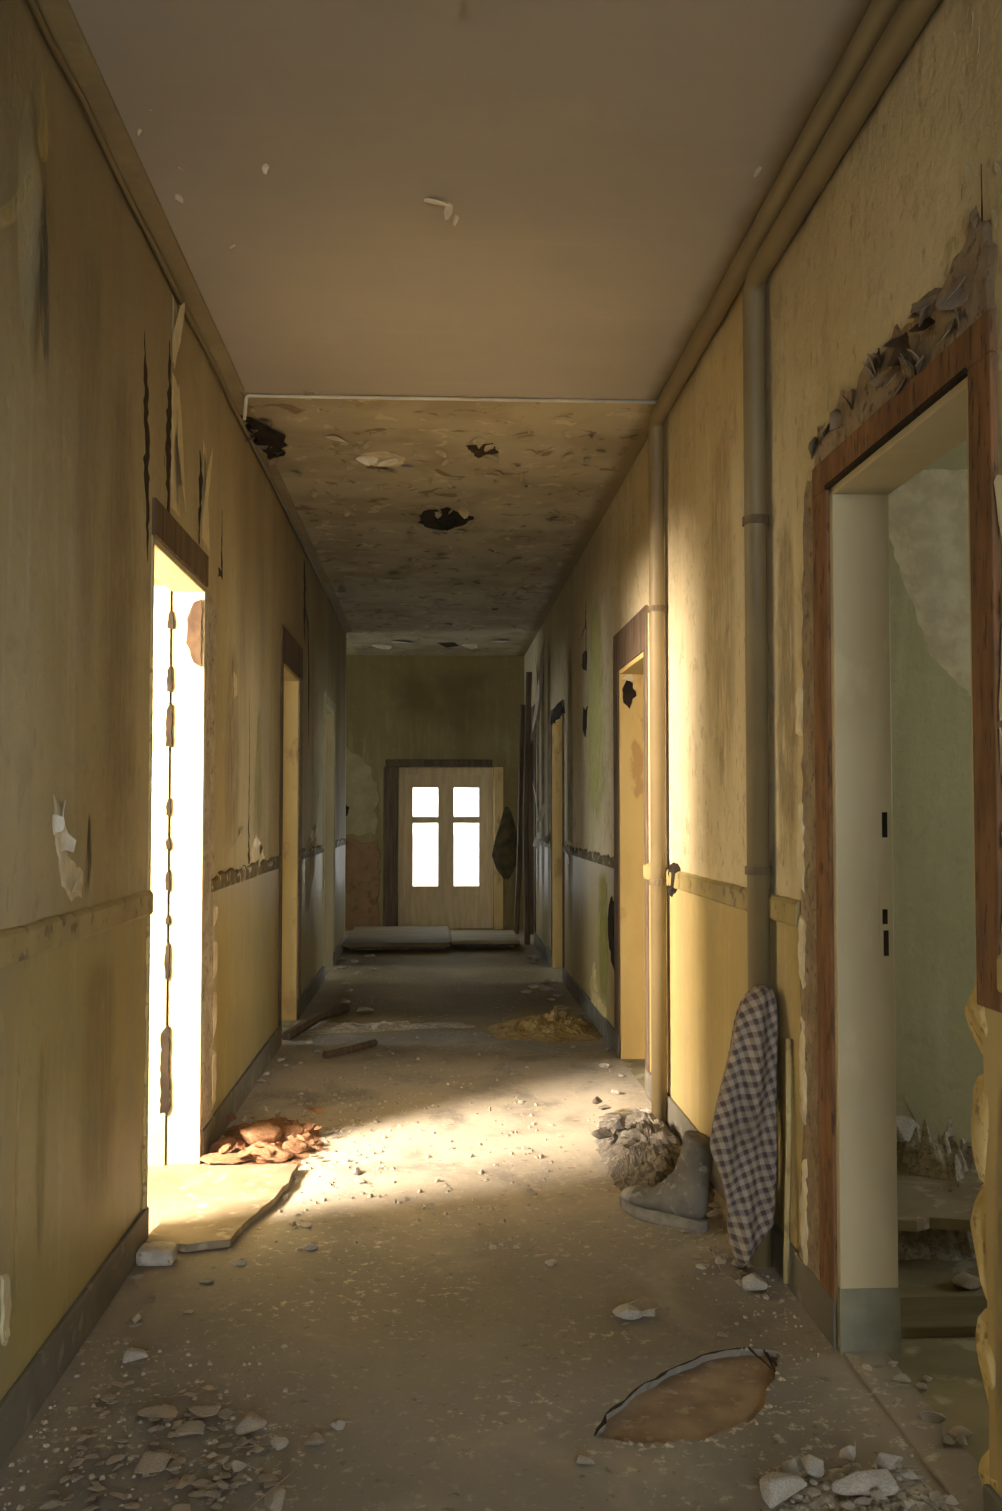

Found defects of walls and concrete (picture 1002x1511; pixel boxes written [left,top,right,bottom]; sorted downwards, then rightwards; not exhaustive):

crack [143,331,223,581]
flaking render [240,415,288,466]
flaking render [410,506,479,535]
flaking render [148,650,173,816]
flaking render [795,206,997,1281]
peeling [52,794,83,902]
flaking render [146,914,170,980]
flaking render [167,590,218,1130]
peeling [345,748,381,930]
flaking render [142,1025,171,1210]
flaking render [970,1073,996,1405]
spalling [594,1322,786,1448]